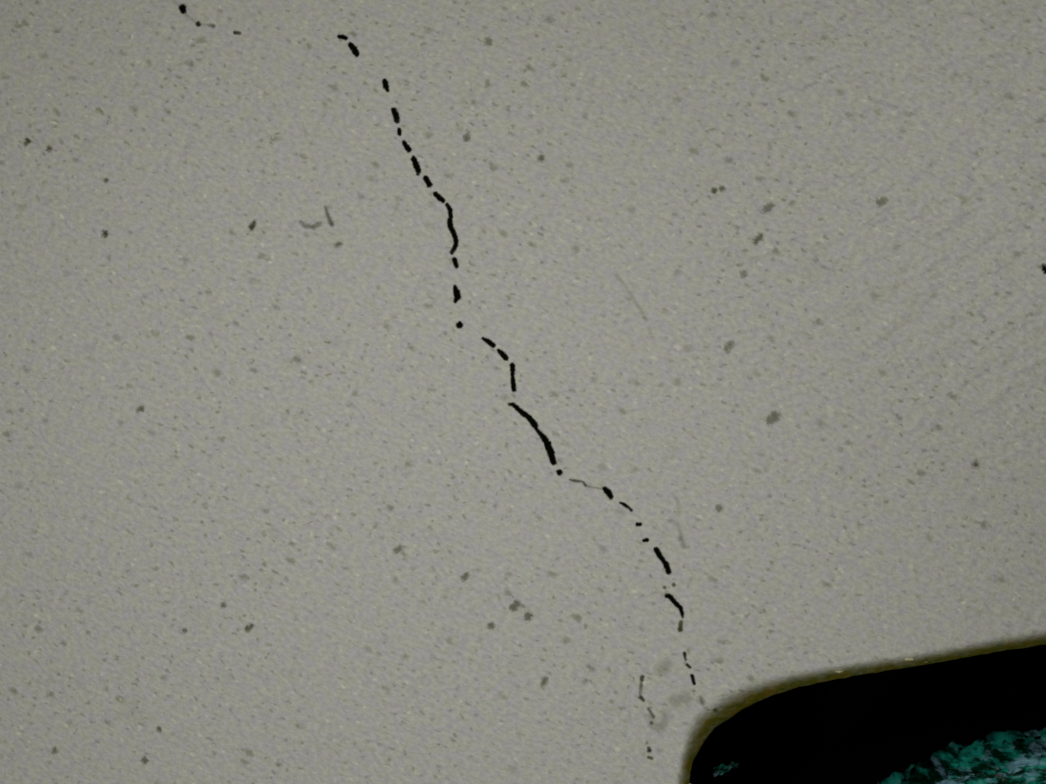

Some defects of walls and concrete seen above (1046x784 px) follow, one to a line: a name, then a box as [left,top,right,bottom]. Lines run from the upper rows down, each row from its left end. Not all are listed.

crack [179,4,200,26]
crack [337,35,359,57]
crack [382,79,696,685]